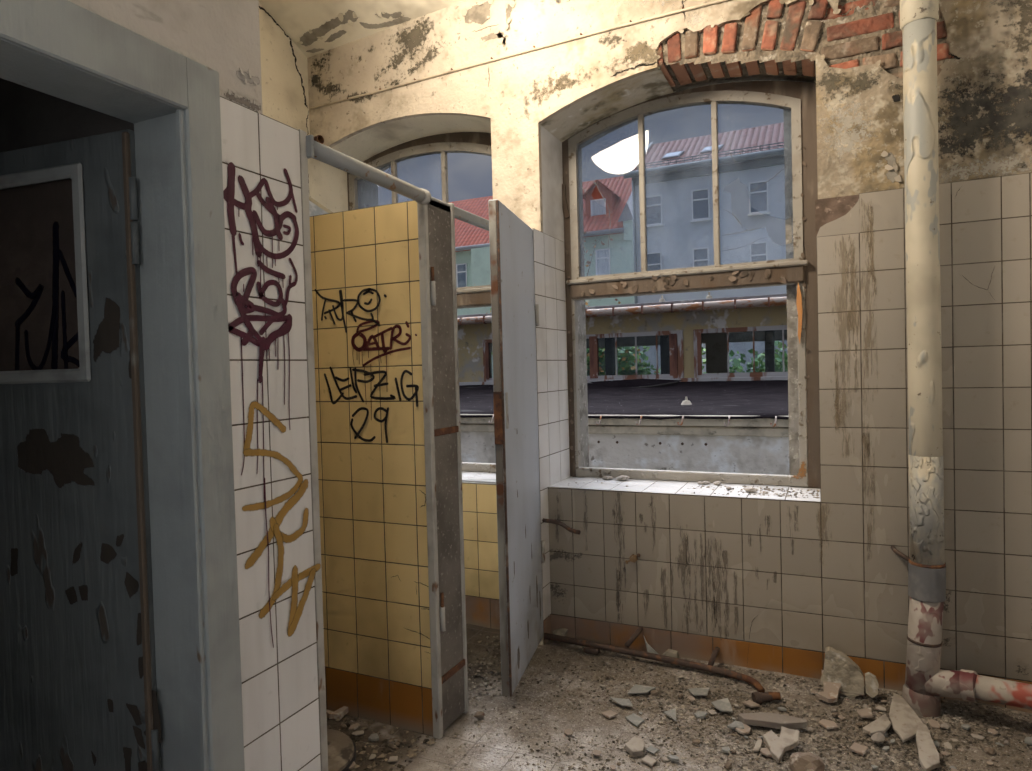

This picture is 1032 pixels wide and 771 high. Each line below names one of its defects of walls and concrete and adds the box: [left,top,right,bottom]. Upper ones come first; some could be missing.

crack [259,6,309,135]
leakage [311,49,372,103]
peeling [297,10,410,53]
leakage [375,15,439,88]
leakage [525,32,662,113]
flaking render [657,0,903,87]
flaking render [937,8,956,76]
leakage [938,0,1032,162]
peeling [17,429,95,488]
leakage [661,530,738,638]
peeling [123,690,162,771]